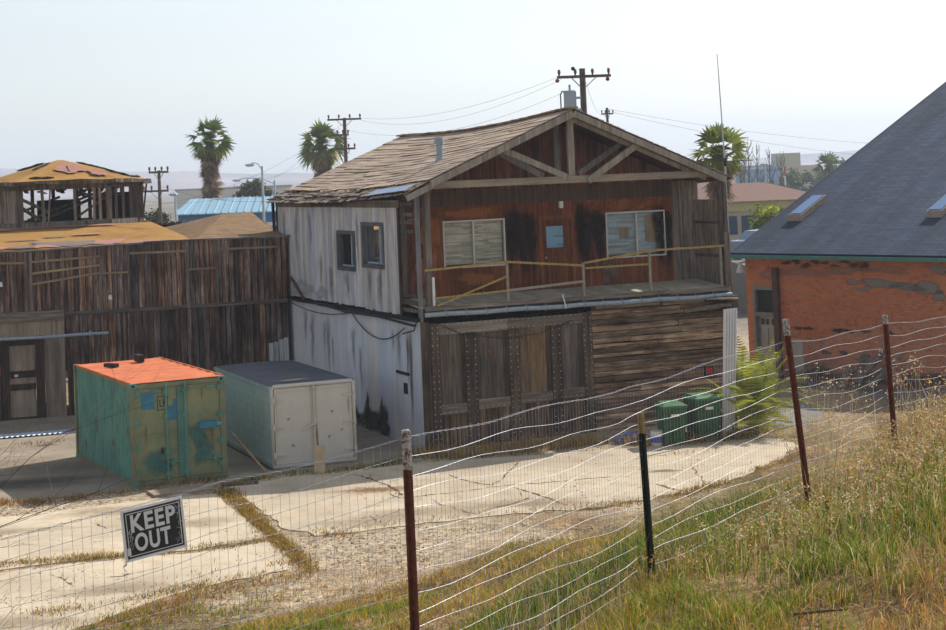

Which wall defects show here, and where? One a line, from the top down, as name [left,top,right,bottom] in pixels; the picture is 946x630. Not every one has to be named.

spalling [782,259,946,301]
crack [355,462,619,513]